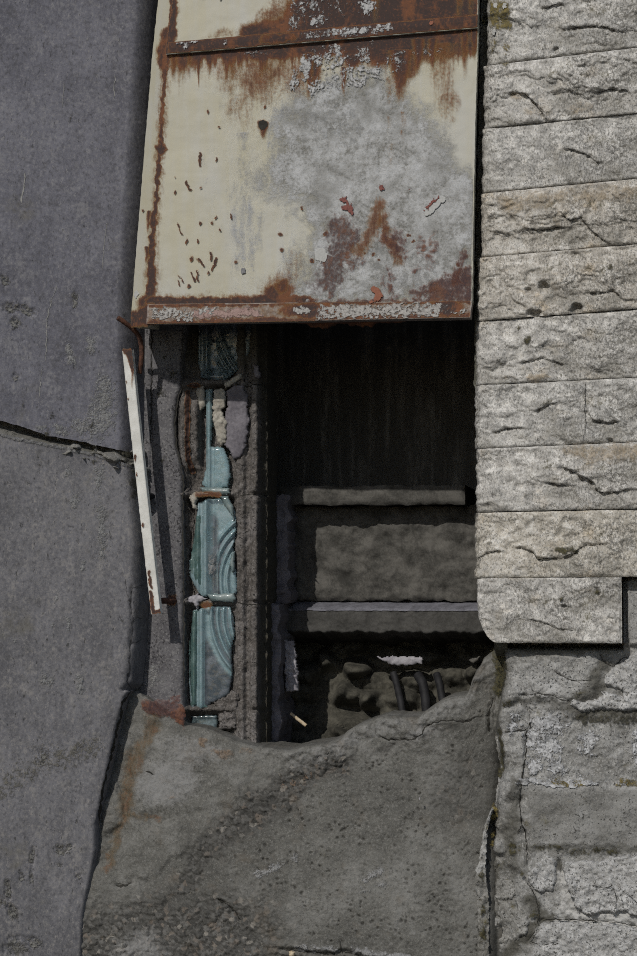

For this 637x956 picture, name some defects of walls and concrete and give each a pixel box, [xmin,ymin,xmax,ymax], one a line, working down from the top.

peeling [289,0,441,97]
rust [131,0,478,327]
rust [141,695,186,725]
crack [380,671,637,945]
crack [277,940,359,956]